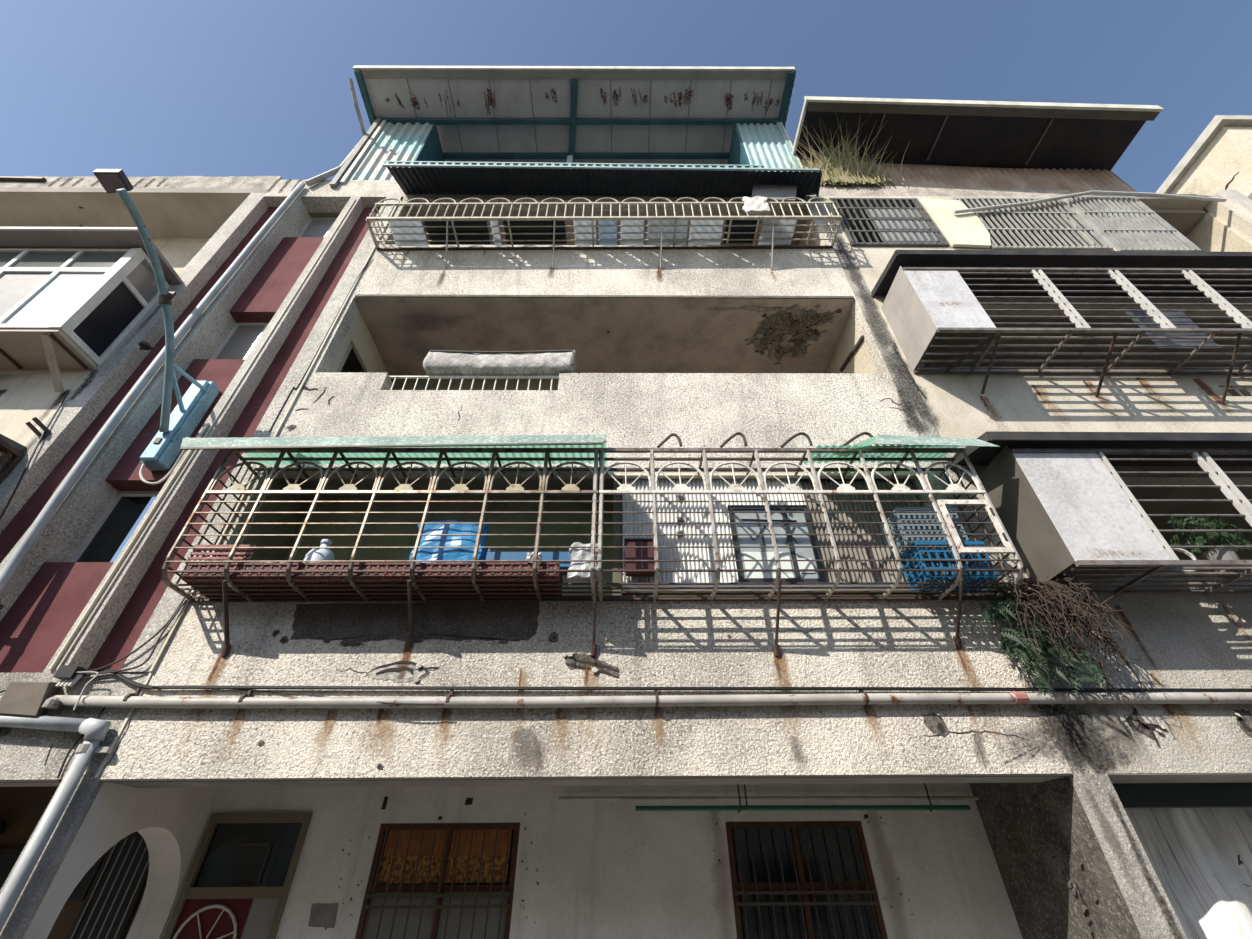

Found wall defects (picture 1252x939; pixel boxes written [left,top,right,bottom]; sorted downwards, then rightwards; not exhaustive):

rust [1194,379,1221,403]
peeling [272,601,619,677]
rust [206,653,225,692]
spalling [366,661,439,682]
rust [773,652,790,694]
rust [955,645,975,687]
rust [373,708,393,737]
spalling [924,712,950,737]
water stain [1007,704,1136,772]
spalling [1125,708,1167,747]
spalling [1234,707,1252,737]